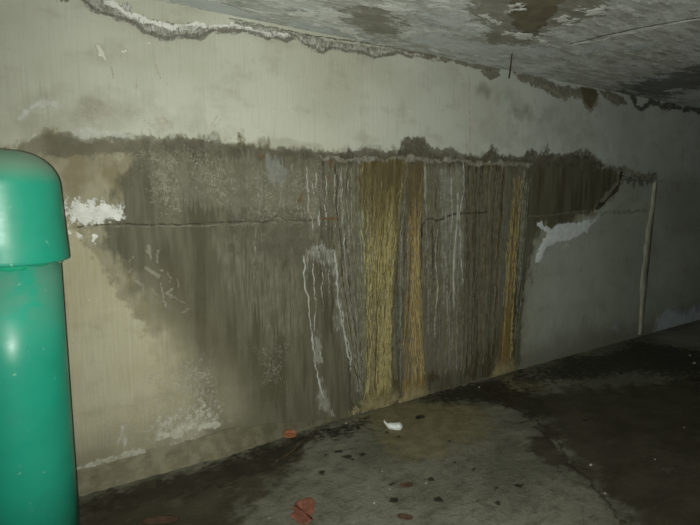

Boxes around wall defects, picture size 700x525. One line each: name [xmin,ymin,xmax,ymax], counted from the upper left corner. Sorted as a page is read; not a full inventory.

spalling [82,0,500,147]
peeling [465,0,609,46]
spalling [513,71,588,109]
spalling [598,90,700,114]
damp [17,118,700,525]
rust [350,156,429,416]
rust [491,176,525,378]